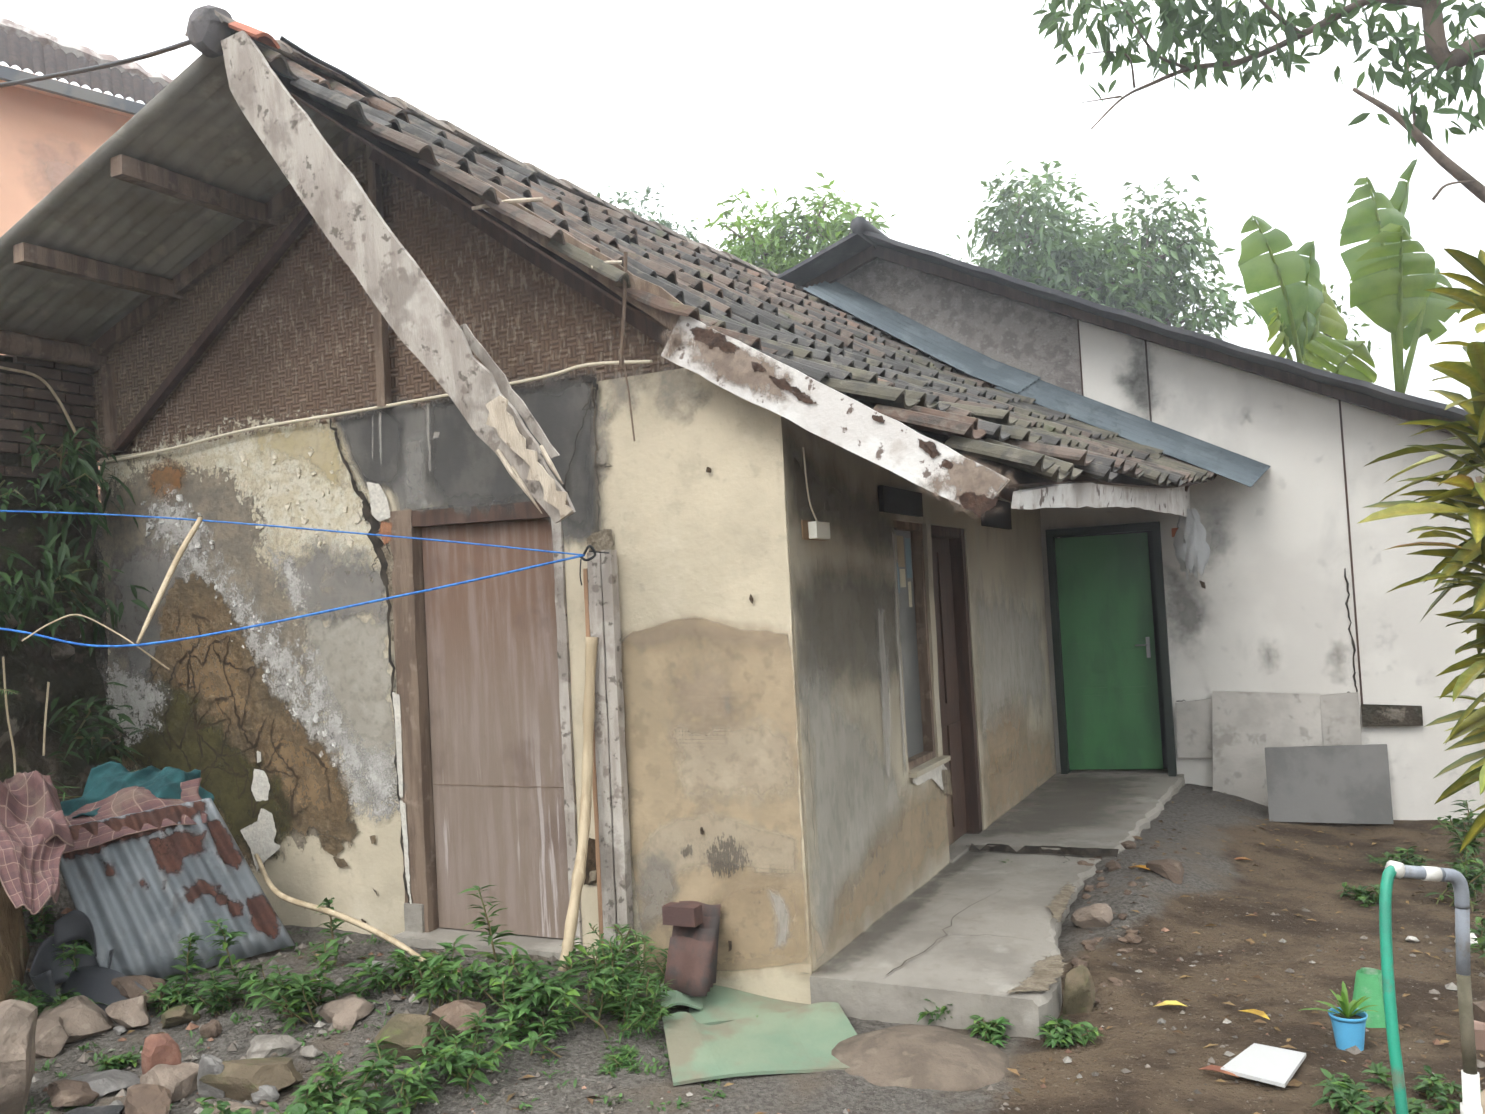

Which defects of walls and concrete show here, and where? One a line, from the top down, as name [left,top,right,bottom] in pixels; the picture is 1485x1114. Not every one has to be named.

flaking render [95,409,395,871]
crack [330,418,410,903]
spalling [392,692,412,904]
leakage [621,440,983,974]
leakage [1171,574,1203,632]